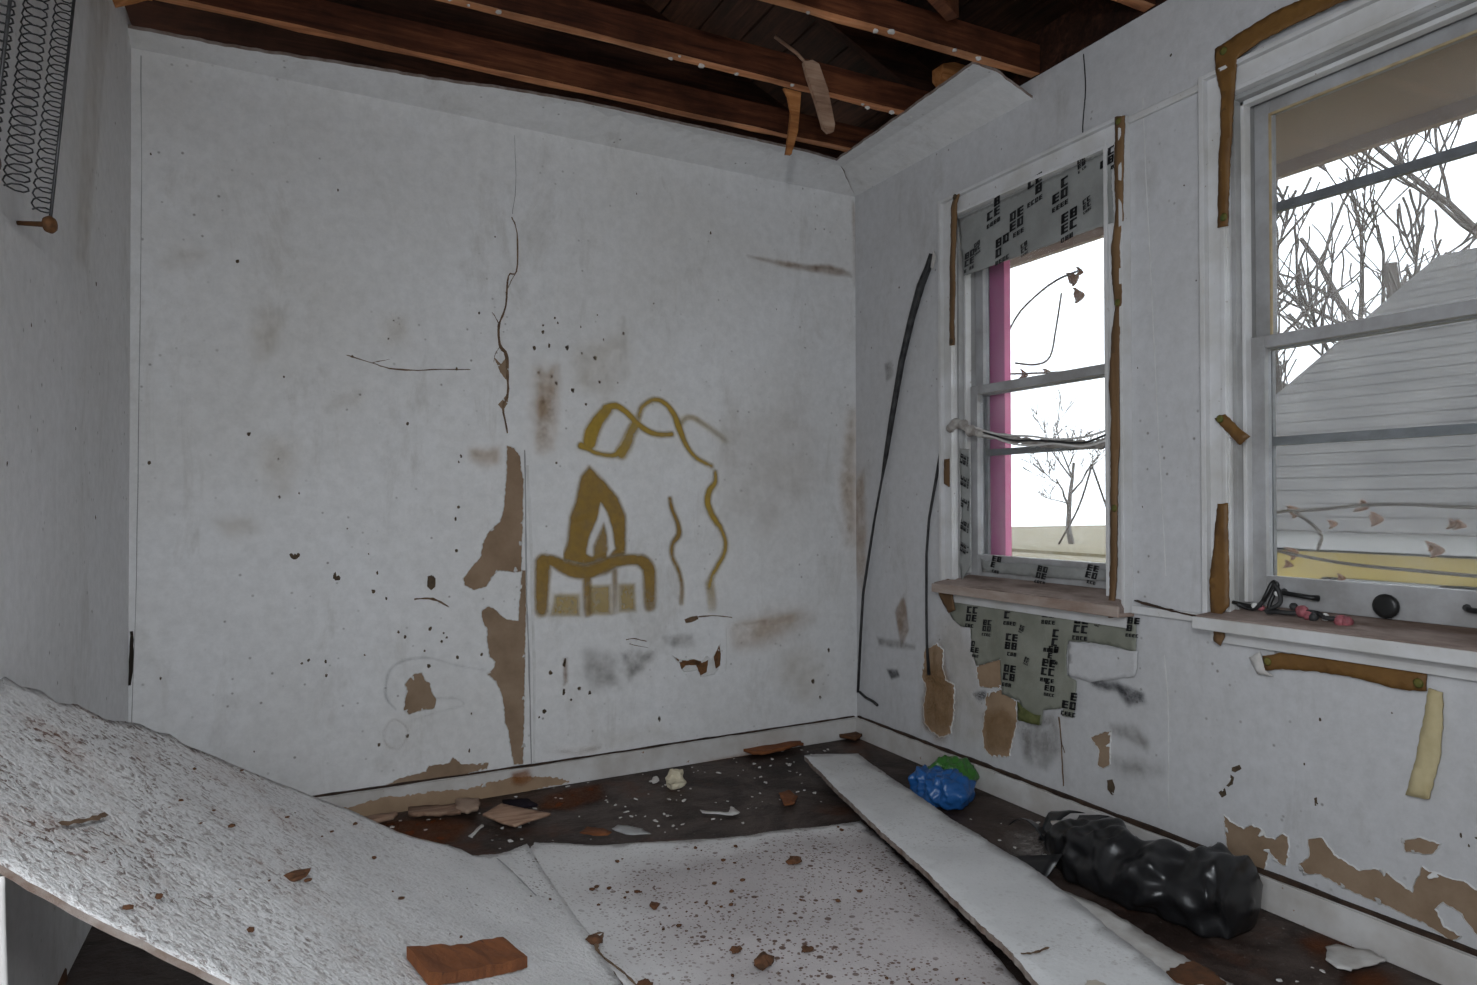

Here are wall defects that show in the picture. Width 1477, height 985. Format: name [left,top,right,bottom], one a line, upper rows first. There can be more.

crack [347,217,518,433]
peeling [427,575,436,590]
peeling [462,445,527,765]
peeling [403,672,437,715]
peeling [921,643,956,738]
peeling [976,659,1019,758]
peeling [385,757,489,787]
peeling [1219,765,1242,797]
peeling [1223,815,1477,941]